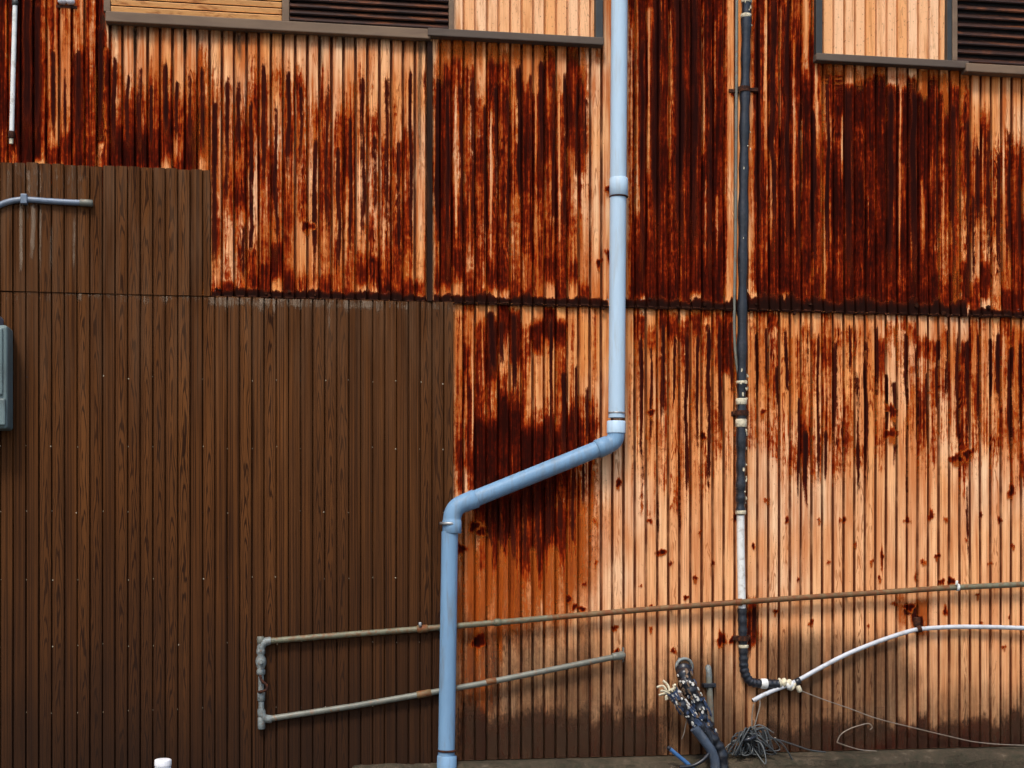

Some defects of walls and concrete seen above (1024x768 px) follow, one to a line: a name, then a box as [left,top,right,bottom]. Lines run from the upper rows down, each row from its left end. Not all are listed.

rust [0,0,609,496]
rust [616,0,1024,550]
rust [457,459,603,717]
rust [716,629,734,648]
rust [746,595,778,656]
rust [870,546,885,584]
rust [890,594,927,637]